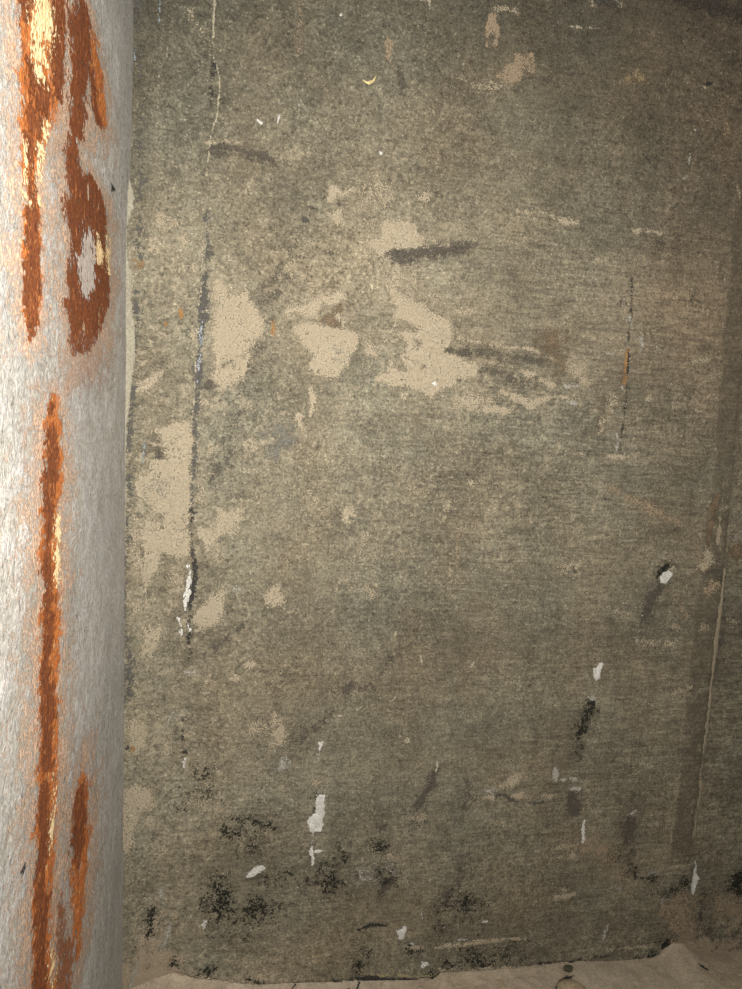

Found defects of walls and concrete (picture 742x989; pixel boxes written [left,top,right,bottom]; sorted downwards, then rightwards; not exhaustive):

peeling [141,202,192,259]
crack [124,0,231,708]
peeling [198,278,267,412]
peeling [281,169,624,436]
corrosion [0,0,144,989]
peeling [125,416,266,667]
peeling [124,715,178,764]
leakage [142,887,173,953]
crack [180,715,188,768]
leakage [167,763,222,813]
leakage [216,808,279,859]
leakage [199,833,411,944]